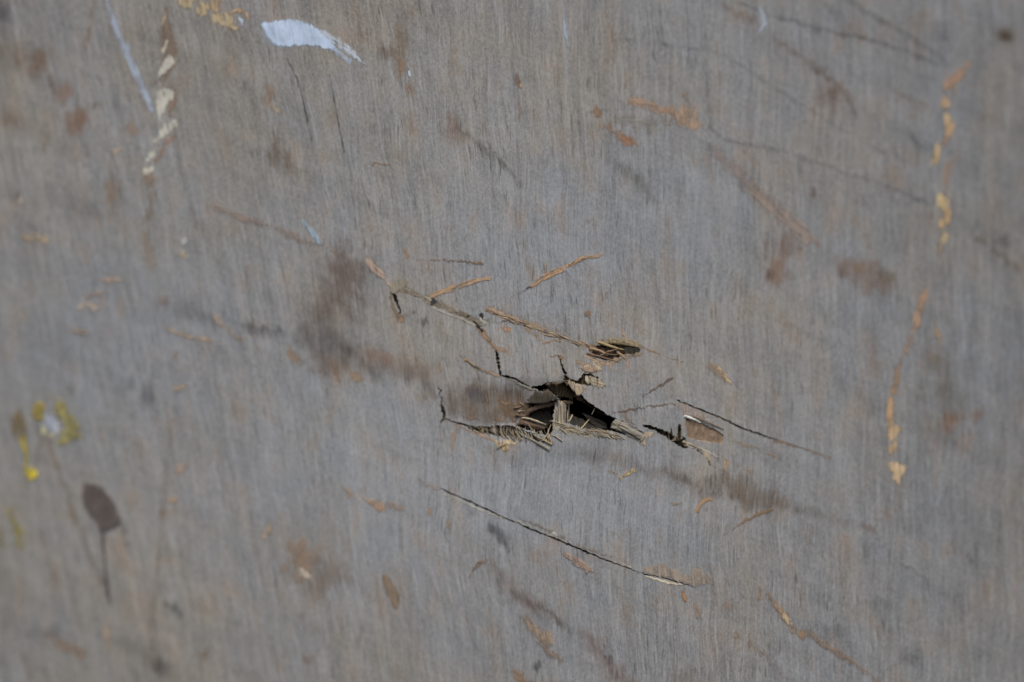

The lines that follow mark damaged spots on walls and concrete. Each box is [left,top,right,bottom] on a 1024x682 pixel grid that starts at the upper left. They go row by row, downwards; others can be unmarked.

peeling [143,0,249,175]
peeling [931,62,972,254]
crack [389,279,518,376]
crack [438,364,505,451]
crack [642,400,805,470]
peeling [886,285,928,485]
crack [425,484,697,588]